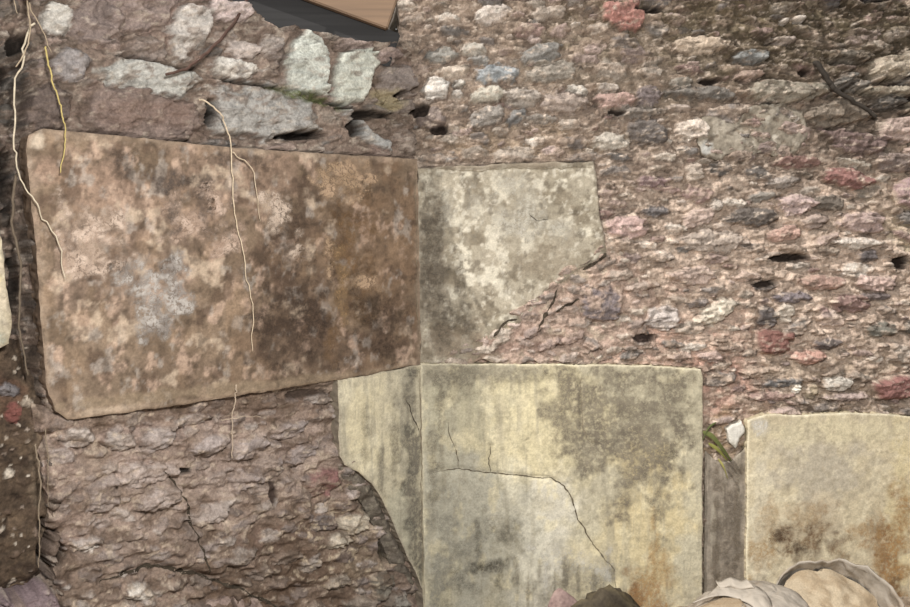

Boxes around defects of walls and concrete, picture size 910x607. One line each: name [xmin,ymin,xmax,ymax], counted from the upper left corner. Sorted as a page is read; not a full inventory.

crack [407,165,616,586]
crack [99,471,277,607]
damp [401,424,424,575]